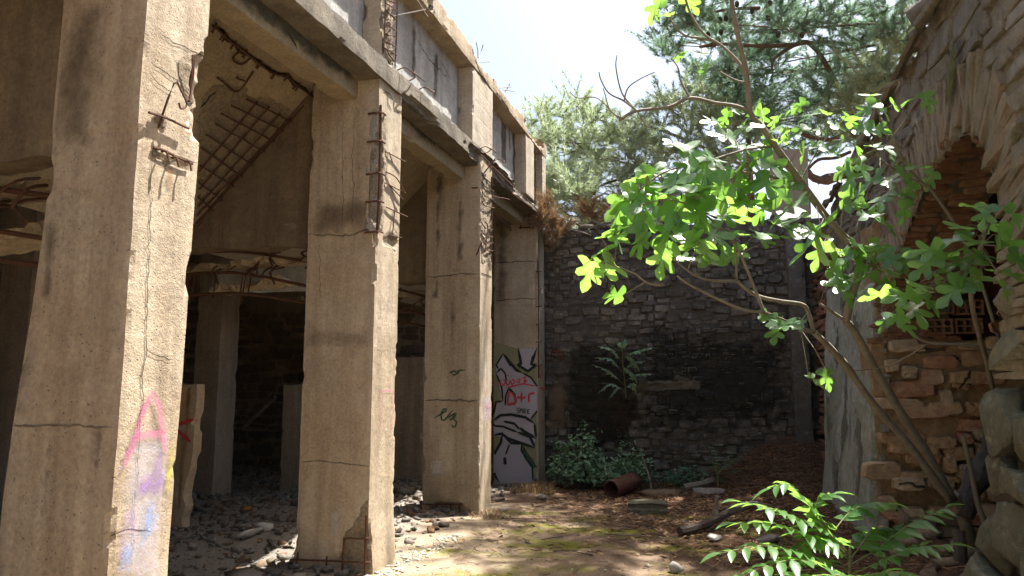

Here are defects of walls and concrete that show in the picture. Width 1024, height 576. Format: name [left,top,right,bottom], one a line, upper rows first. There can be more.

spalling [148,23,314,217]
spalling [186,250,307,304]
crack [308,122,369,299]
spalling [364,105,408,241]
crack [111,149,196,566]
crack [14,422,113,430]
spalling [292,500,467,576]